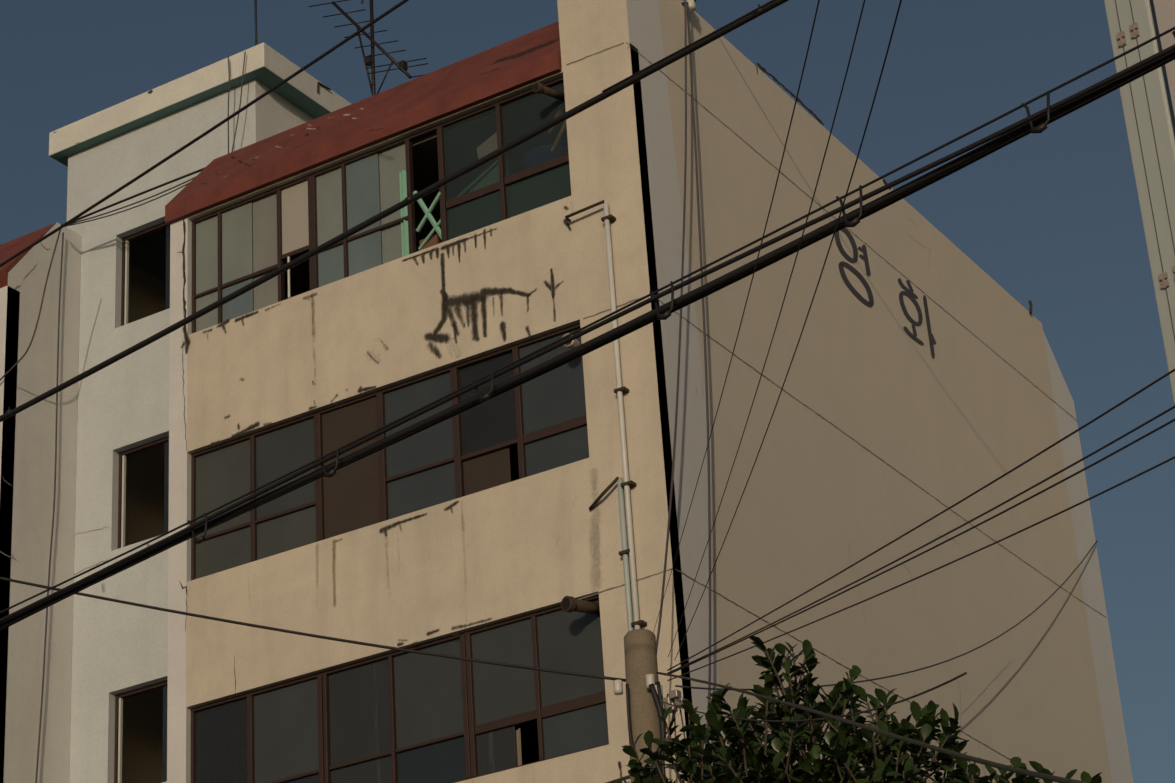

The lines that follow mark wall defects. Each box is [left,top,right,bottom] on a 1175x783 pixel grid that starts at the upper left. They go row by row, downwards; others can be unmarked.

leakage [402,229,563,358]